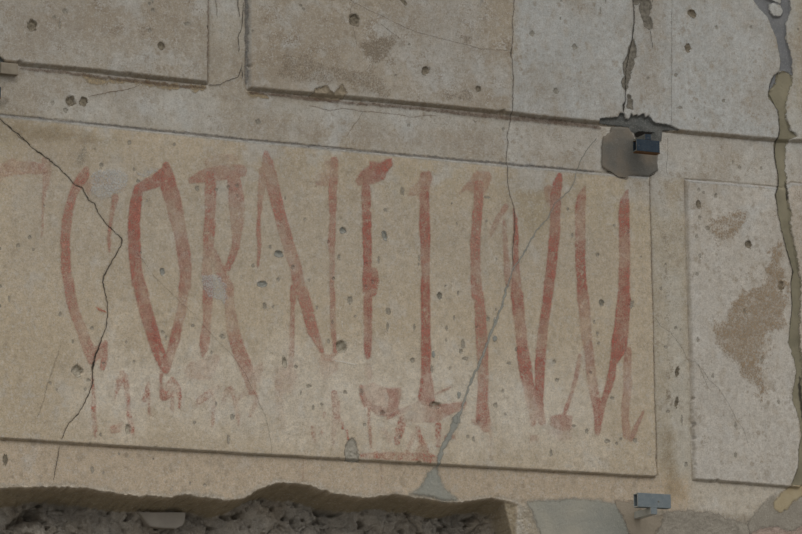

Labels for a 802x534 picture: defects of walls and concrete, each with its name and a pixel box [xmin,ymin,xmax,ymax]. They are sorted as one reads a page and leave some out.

crack [0,119,123,480]
crack [437,0,597,468]
crack [623,0,653,112]
damp [713,243,789,400]
crack [754,0,802,486]